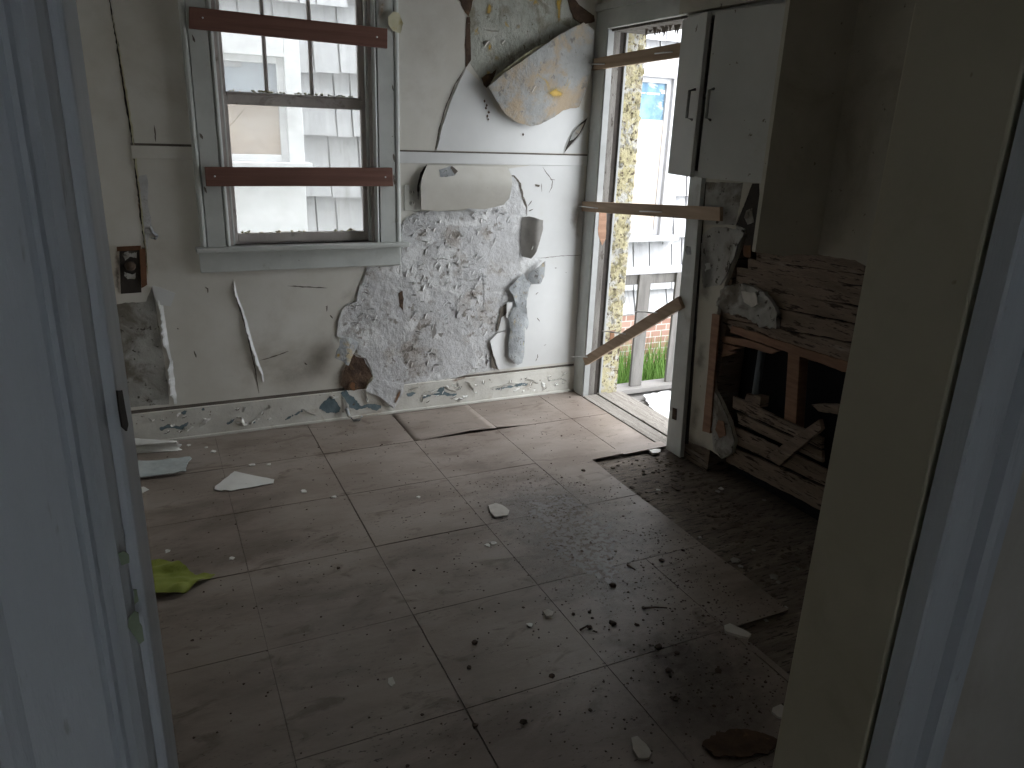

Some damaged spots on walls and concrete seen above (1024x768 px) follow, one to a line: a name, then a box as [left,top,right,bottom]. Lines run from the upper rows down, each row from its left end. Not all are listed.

crack [109,0,148,274]
flaking render [460,0,595,120]
flaking render [117,285,211,434]
flaking render [285,175,569,422]